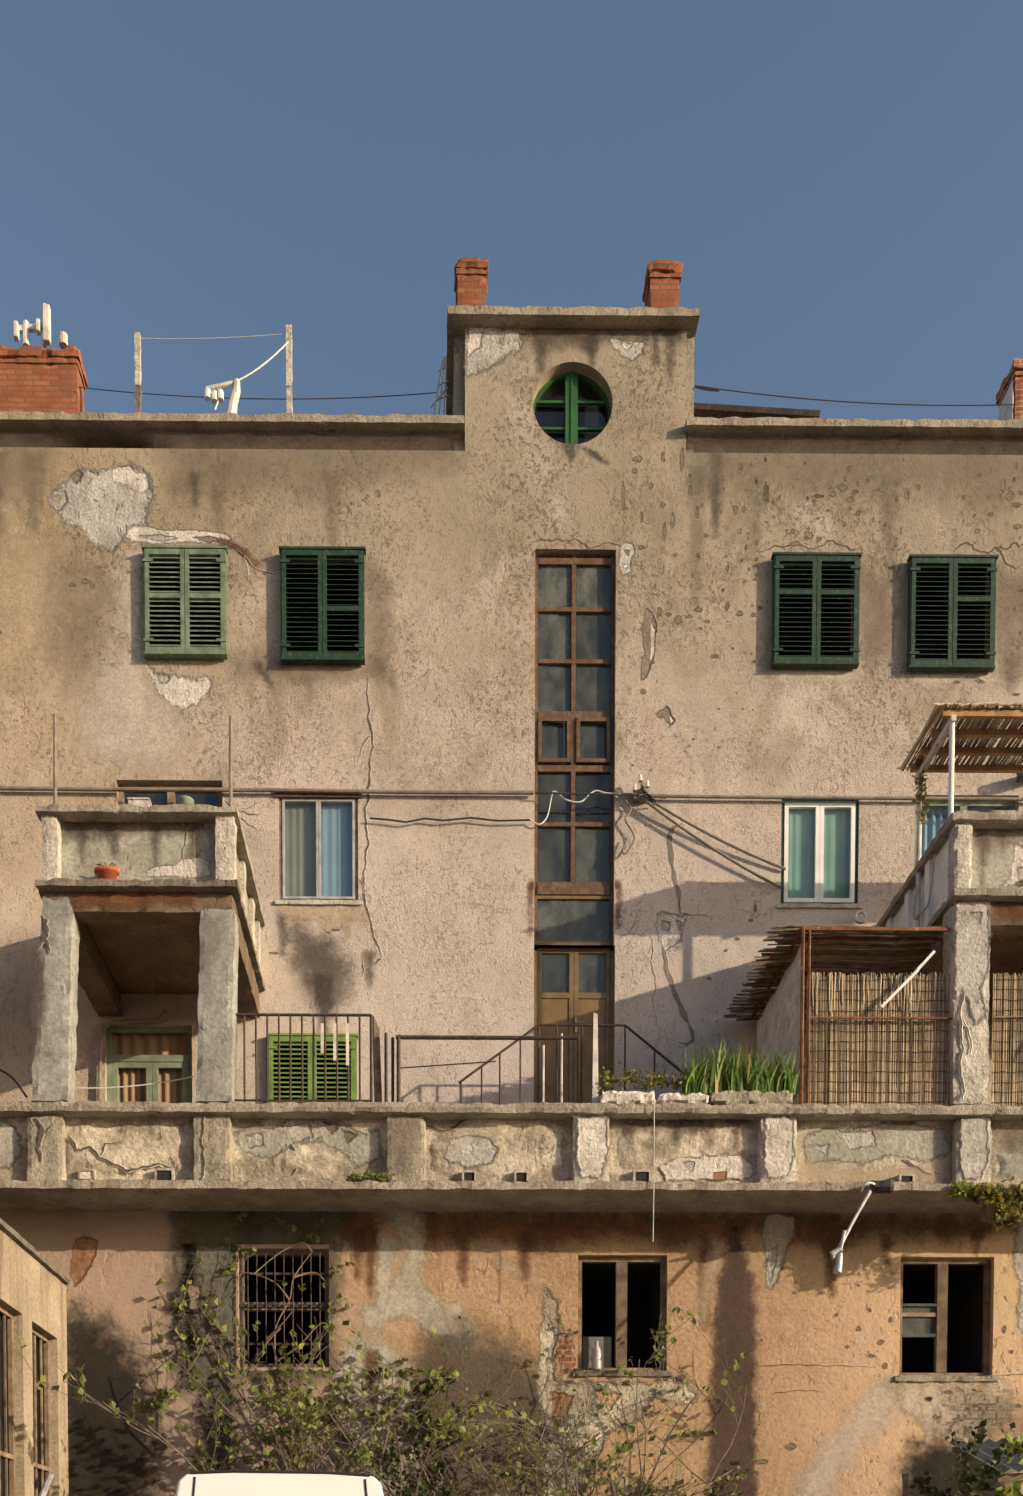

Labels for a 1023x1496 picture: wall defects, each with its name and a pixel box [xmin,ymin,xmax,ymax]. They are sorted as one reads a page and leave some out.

peeling [48,463,226,765]
crack [954,541,1023,569]
crack [357,678,382,977]
crack [621,822,713,1047]
peeling [70,1236,98,1287]
leakage [412,1212,765,1496]
peeling [535,1284,697,1496]
peeling [761,1213,796,1290]
leakage [782,1213,1016,1294]
peeling [1002,1225,1023,1334]